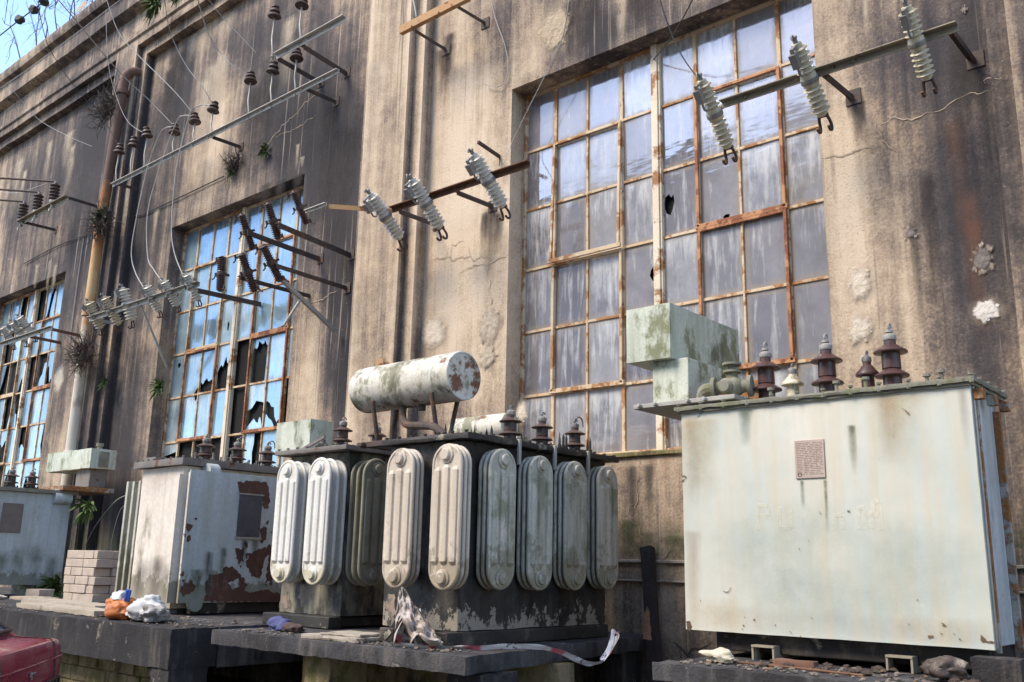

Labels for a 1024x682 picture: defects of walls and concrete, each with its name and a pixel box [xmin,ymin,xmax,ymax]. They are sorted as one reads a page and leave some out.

crack [826,76,1003,158]
crack [433,240,505,290]
spalling [970,242,994,275]
damp [627,466,651,499]